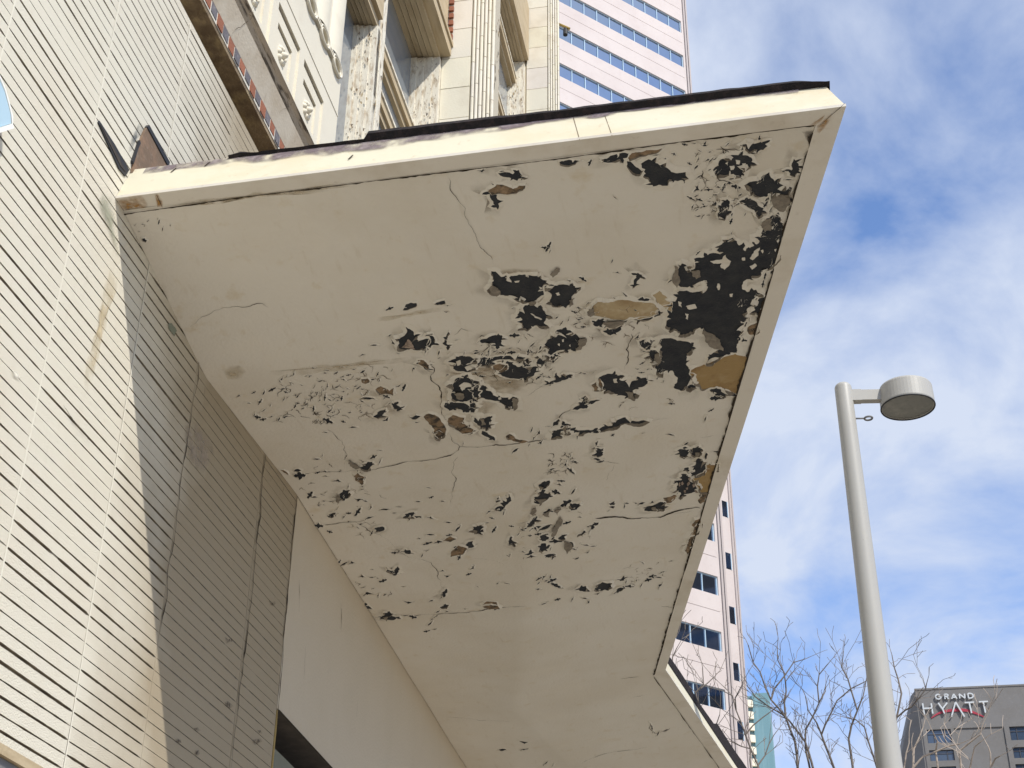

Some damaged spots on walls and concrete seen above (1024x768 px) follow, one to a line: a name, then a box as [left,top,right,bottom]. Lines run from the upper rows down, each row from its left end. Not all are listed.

crack [124,103,845,768]
peeling [237,134,805,633]